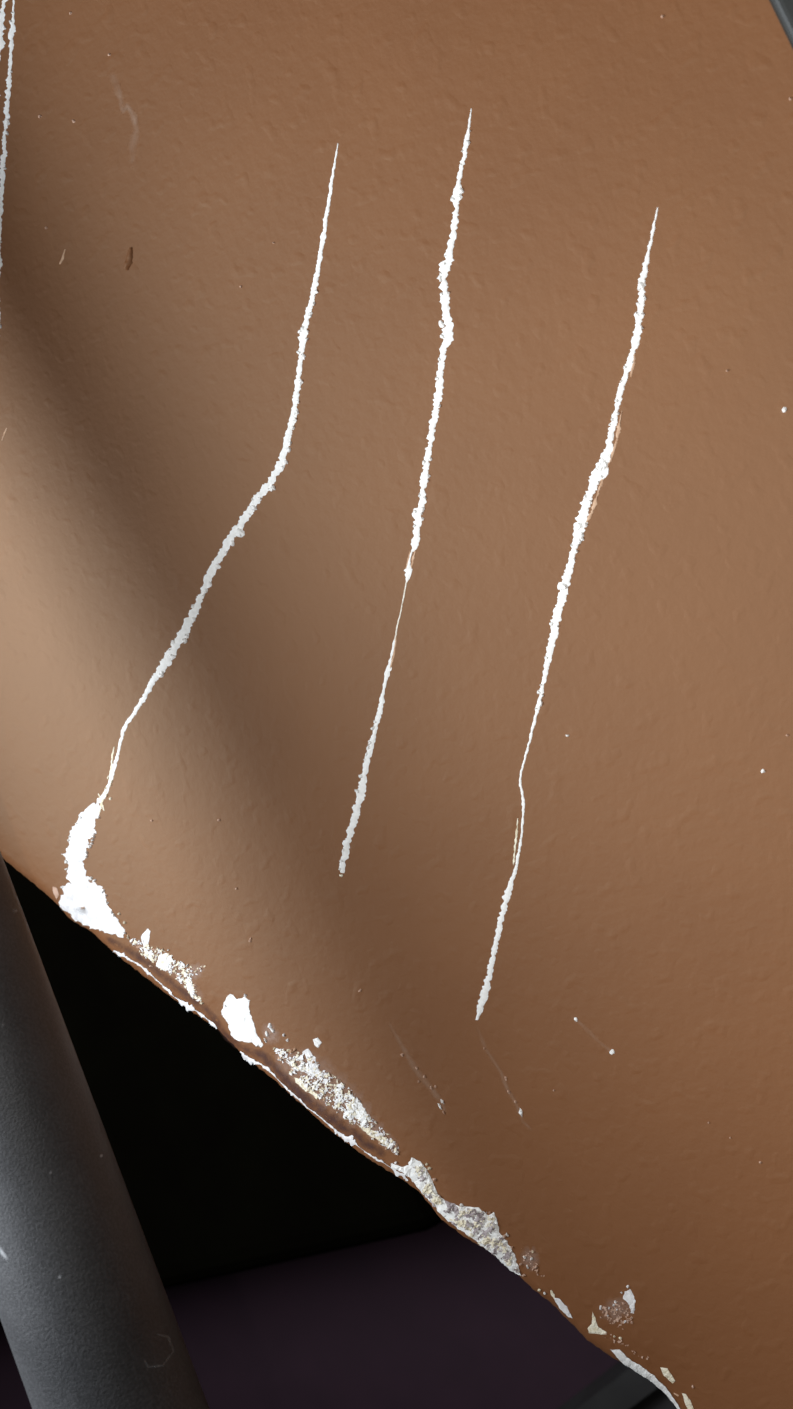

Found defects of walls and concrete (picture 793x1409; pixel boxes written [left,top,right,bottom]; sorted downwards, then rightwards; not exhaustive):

spalling [53,801,572,1318]
spalling [588,1285,694,1409]